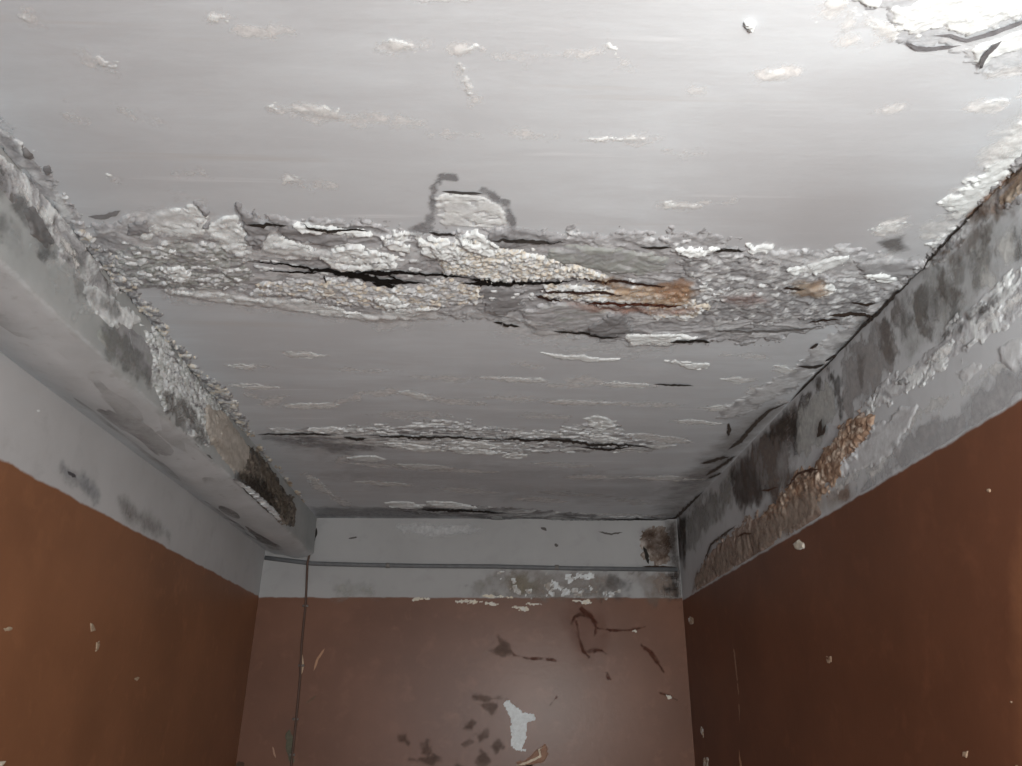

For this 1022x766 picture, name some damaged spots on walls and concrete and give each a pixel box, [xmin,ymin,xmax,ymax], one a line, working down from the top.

peeling [816,0,1022,77]
crack [429,230,456,238]
crack [494,237,565,245]
crack [246,261,689,308]
spalling [0,116,1022,527]
crack [256,433,649,451]
damp [677,234,1022,587]
peeling [696,267,1022,590]
spalling [384,501,678,567]
damp [497,571,624,600]
peeling [493,700,549,766]